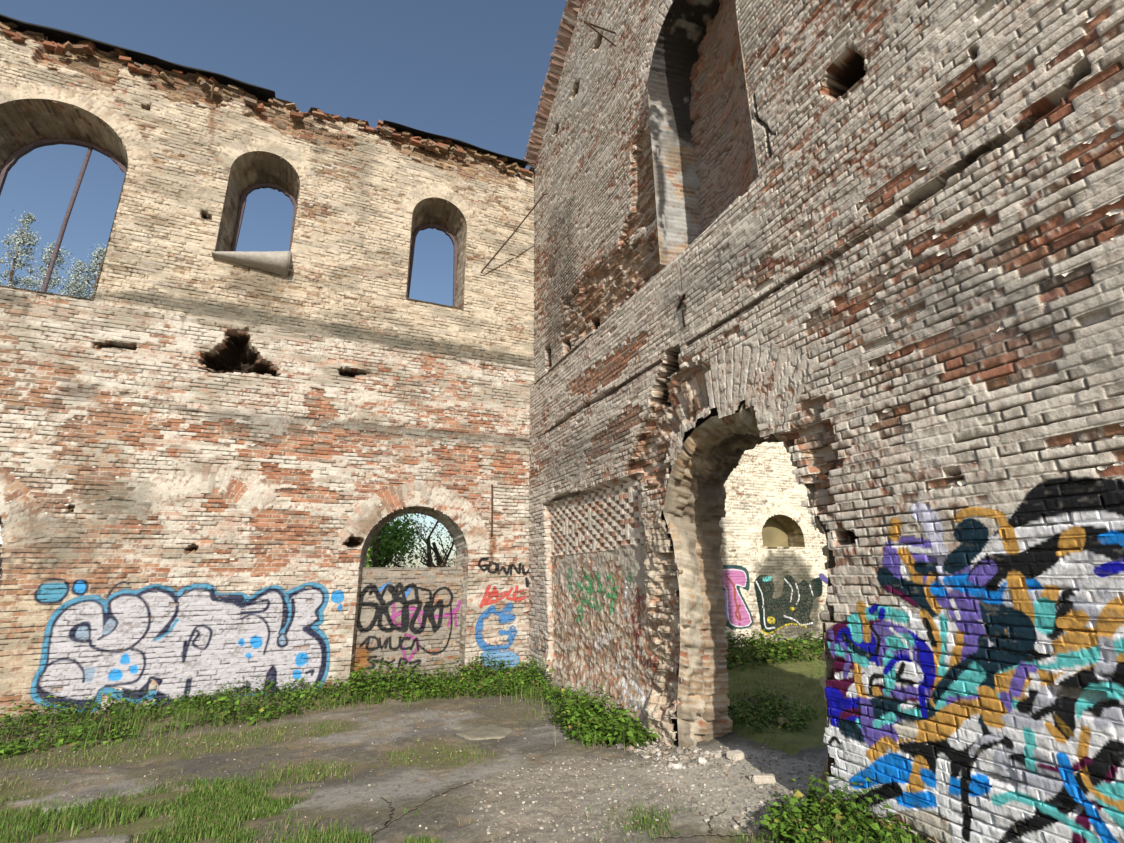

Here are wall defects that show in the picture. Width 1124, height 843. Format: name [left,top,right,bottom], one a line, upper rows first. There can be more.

peeling [936,6,1124,130]
spalling [199,327,281,377]
spalling [778,395,844,516]
crack [380,797,394,826]